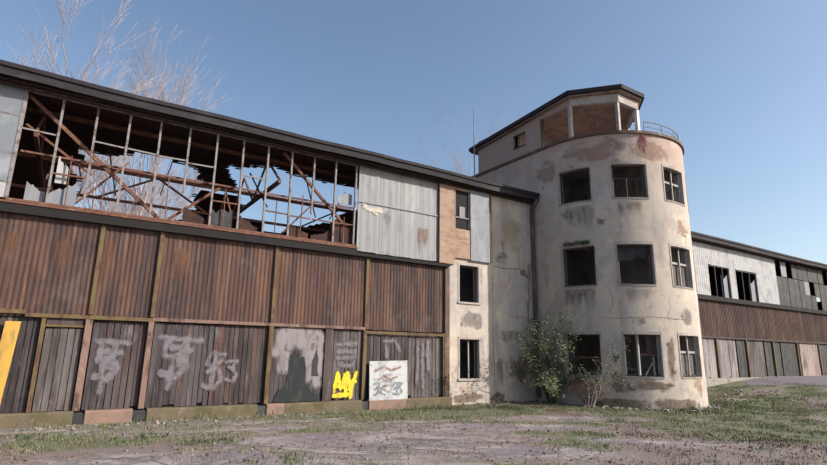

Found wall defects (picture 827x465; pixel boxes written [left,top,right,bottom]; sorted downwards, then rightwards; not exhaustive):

flaking render [563,137,668,169]
crack [492,261,525,391]